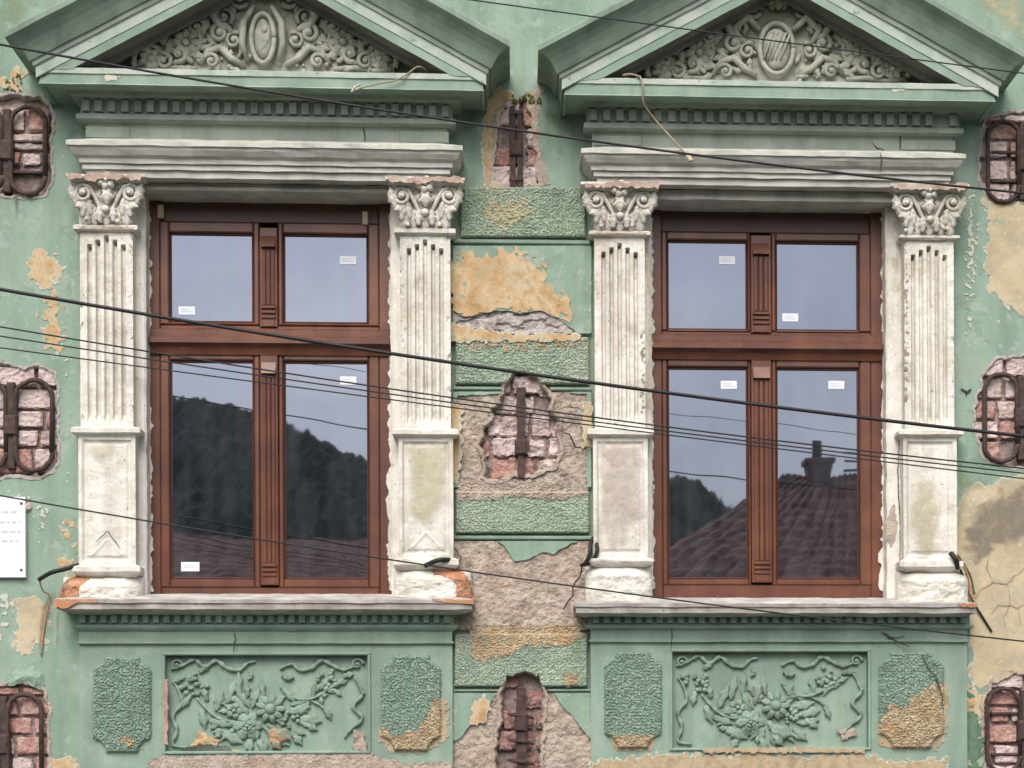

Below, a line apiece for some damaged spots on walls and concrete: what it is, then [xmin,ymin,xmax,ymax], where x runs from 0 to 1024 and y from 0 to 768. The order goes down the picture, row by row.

flaking render [0,65,143,200]
peeling [451,86,587,355]
peeling [893,108,1024,335]
flaking render [0,248,98,656]
peeling [451,373,594,502]
flaking render [432,541,591,664]
peeling [957,353,1024,768]
crack [974,556,1024,632]
flaking render [0,680,80,768]
peeling [117,671,950,768]